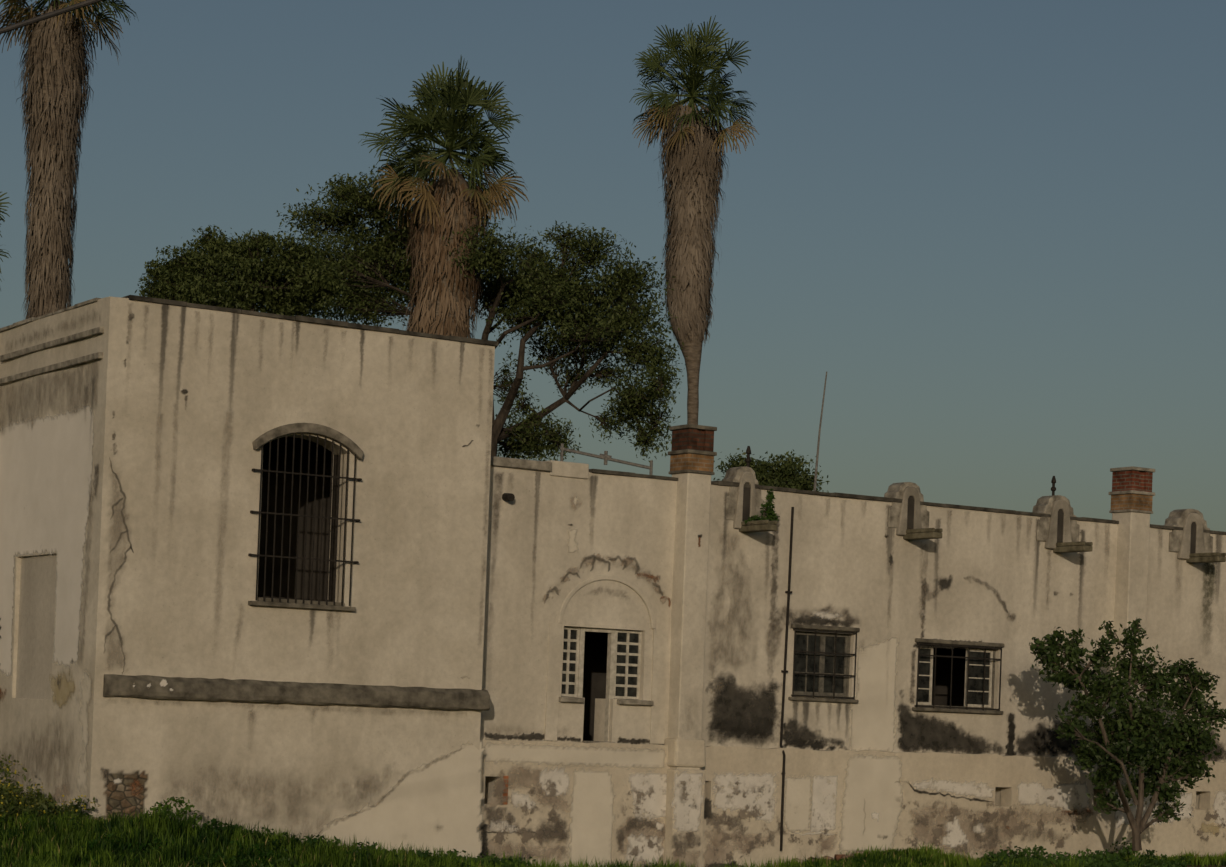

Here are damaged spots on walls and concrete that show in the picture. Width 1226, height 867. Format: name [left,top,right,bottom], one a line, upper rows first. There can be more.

water stain [162,304,186,347]
crack [109,457,134,559]
flaking render [543,554,671,606]
water stain [898,575,1123,756]
water stain [710,676,843,751]
flaking render [102,769,148,818]
flaking render [479,767,569,859]
flaking render [904,782,1091,857]
peeling [1115,792,1226,841]